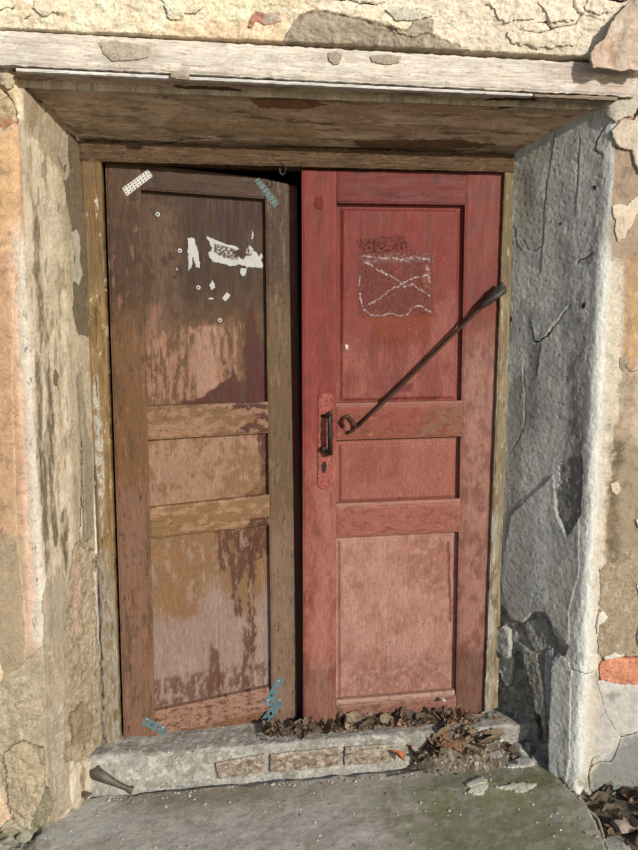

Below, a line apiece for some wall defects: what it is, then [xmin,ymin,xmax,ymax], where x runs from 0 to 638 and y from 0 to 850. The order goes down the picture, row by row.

flaking render [486,0,638,172]
flaking render [612,196,638,241]
flaking render [0,124,45,787]
leakage [37,361,68,570]
peeling [492,454,584,781]
spalling [596,551,638,685]
flaking render [0,797,11,827]